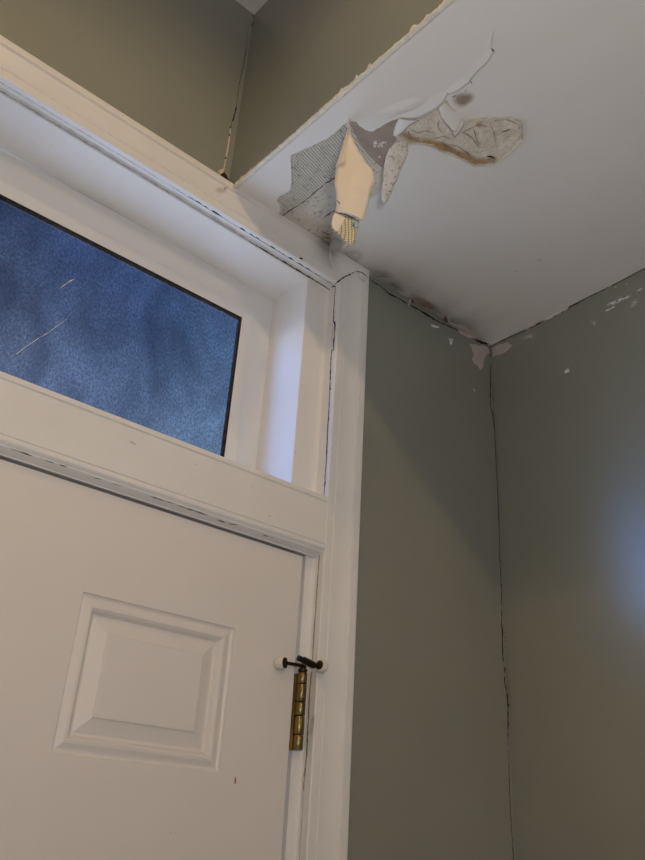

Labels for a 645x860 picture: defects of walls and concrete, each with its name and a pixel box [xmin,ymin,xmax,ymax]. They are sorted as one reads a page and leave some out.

crack [223,13,254,169]
peeling [232,0,523,267]
crack [0,82,490,491]
peeling [444,269,644,370]
crack [490,370,514,860]